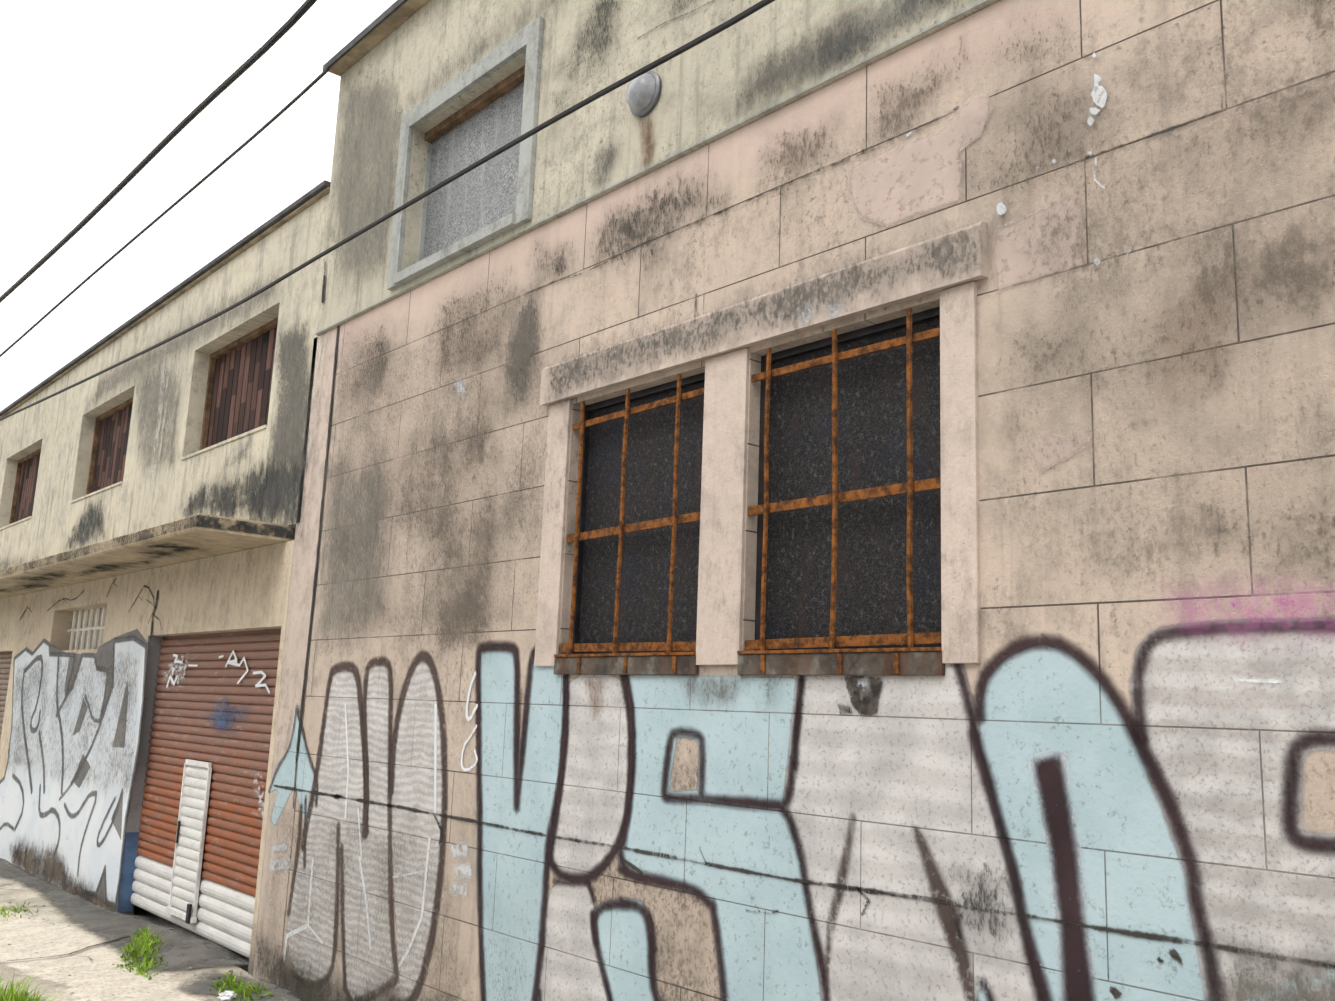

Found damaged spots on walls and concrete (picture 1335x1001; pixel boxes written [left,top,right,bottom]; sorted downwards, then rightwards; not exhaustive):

leakage [736,0,959,113]
leakage [867,41,968,142]
leakage [335,83,401,275]
leakage [435,272,538,412]
leakage [534,242,573,282]
leakage [592,178,727,277]
leakage [547,228,983,397]
leakage [0,325,309,577]
leakage [323,400,495,648]